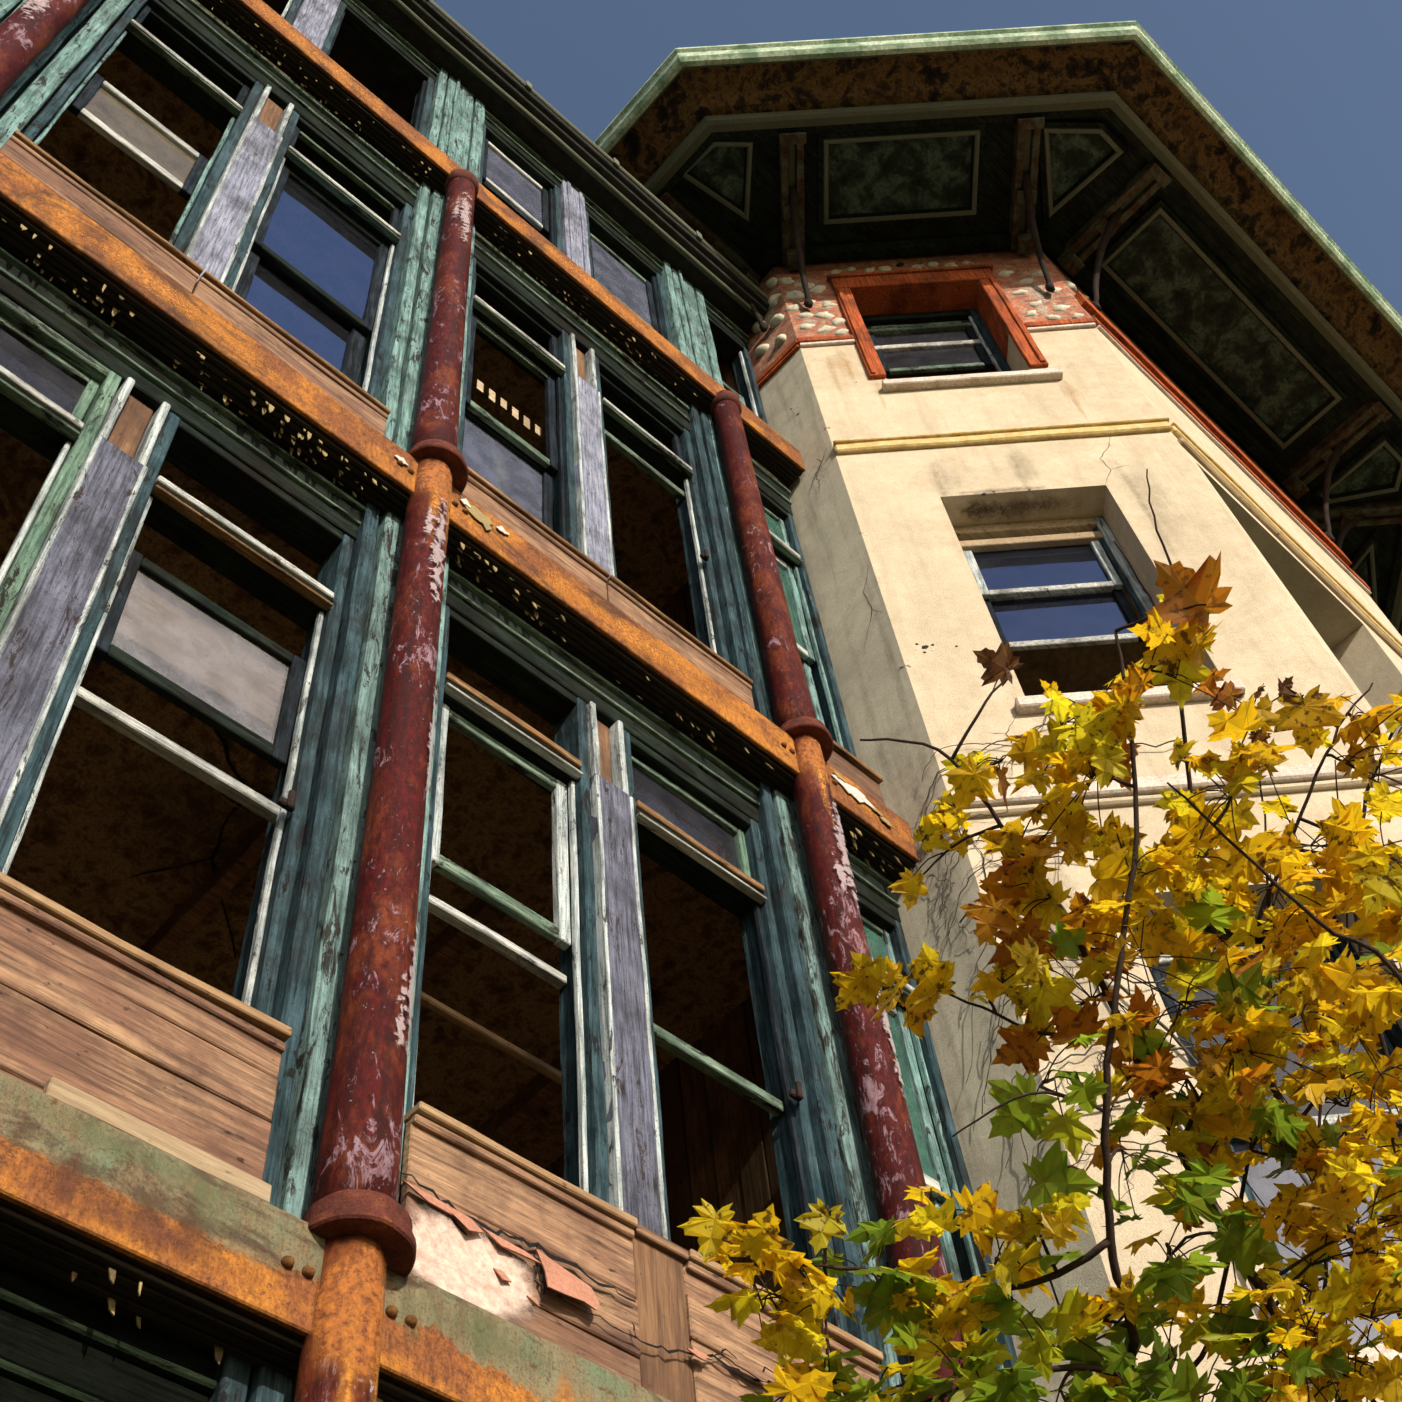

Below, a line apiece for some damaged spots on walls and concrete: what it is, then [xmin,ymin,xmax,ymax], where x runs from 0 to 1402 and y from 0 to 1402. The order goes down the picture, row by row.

corrosion [104,245,253,358]
corrosion [415,462,452,546]
corrosion [796,739,836,807]
peeling [830,771,902,913]
peeling [877,990,904,1092]
corrosion [312,1245,385,1402]
peeling [402,1180,599,1316]
crack [400,1172,774,1383]